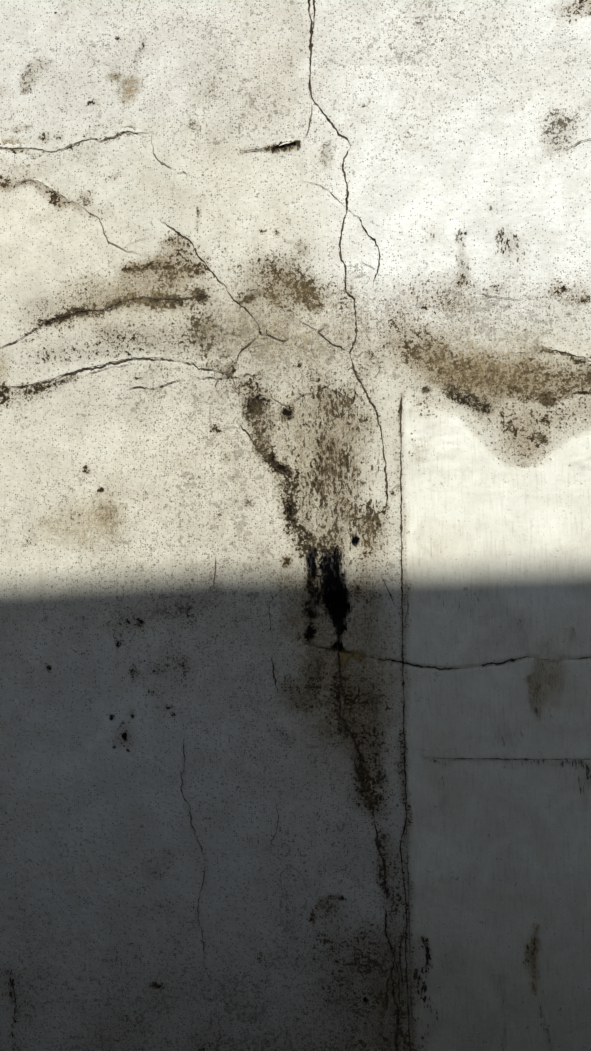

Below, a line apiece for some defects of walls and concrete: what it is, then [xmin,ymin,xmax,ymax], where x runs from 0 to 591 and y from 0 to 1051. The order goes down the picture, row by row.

crack [44,131,186,173]
spalling [242,139,301,157]
crack [1,179,145,253]
crack [0,222,294,393]
damp [16,207,352,342]
crack [273,386,344,406]
damp [377,228,591,467]
damp [69,487,121,532]
crack [238,424,300,540]
crack [298,0,549,1051]
mould [107,611,146,648]
damp [226,370,438,1051]